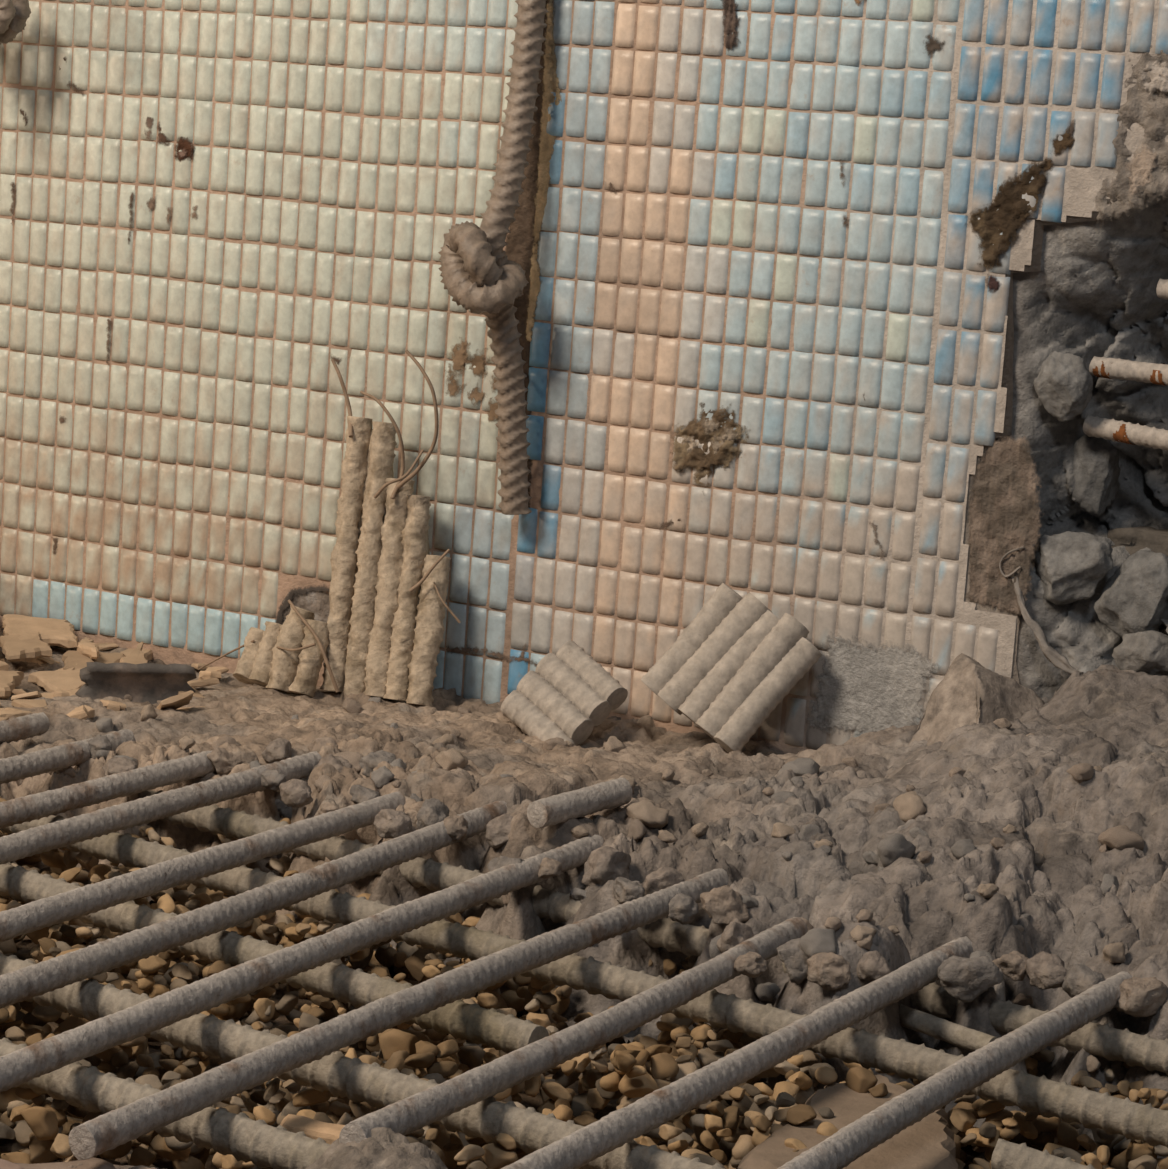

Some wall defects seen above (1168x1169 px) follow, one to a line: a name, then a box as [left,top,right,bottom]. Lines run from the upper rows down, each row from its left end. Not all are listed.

spalling [723,0,740,50]
peeling [1095,46,1168,220]
spalling [438,0,562,515]
spalling [1156,278,1168,299]
spalling [1089,356,1168,386]
spalling [672,404,749,485]
spalling [1083,415,1168,451]
peeling [966,436,1041,615]
spalling [0,712,136,785]
spalling [0,750,1168,1169]